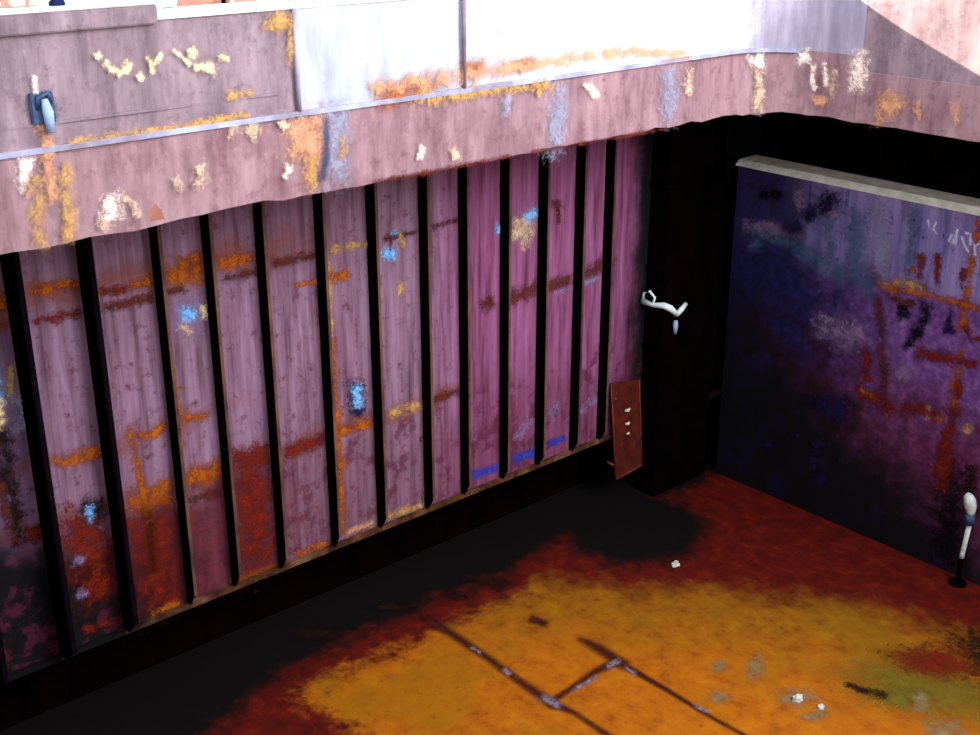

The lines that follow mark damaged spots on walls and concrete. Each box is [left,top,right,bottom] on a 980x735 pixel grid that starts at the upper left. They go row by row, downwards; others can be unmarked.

peeling [93,46,230,82]
rust [368,43,690,109]
peeling [749,53,766,113]
peeling [798,48,870,106]
rust [27,126,79,247]
rust [69,111,250,144]
rust [286,108,325,188]
rust [98,275,153,312]
rust [854,216,980,494]
rust [59,509,118,607]
rust [124,422,187,616]
rust [186,441,278,581]